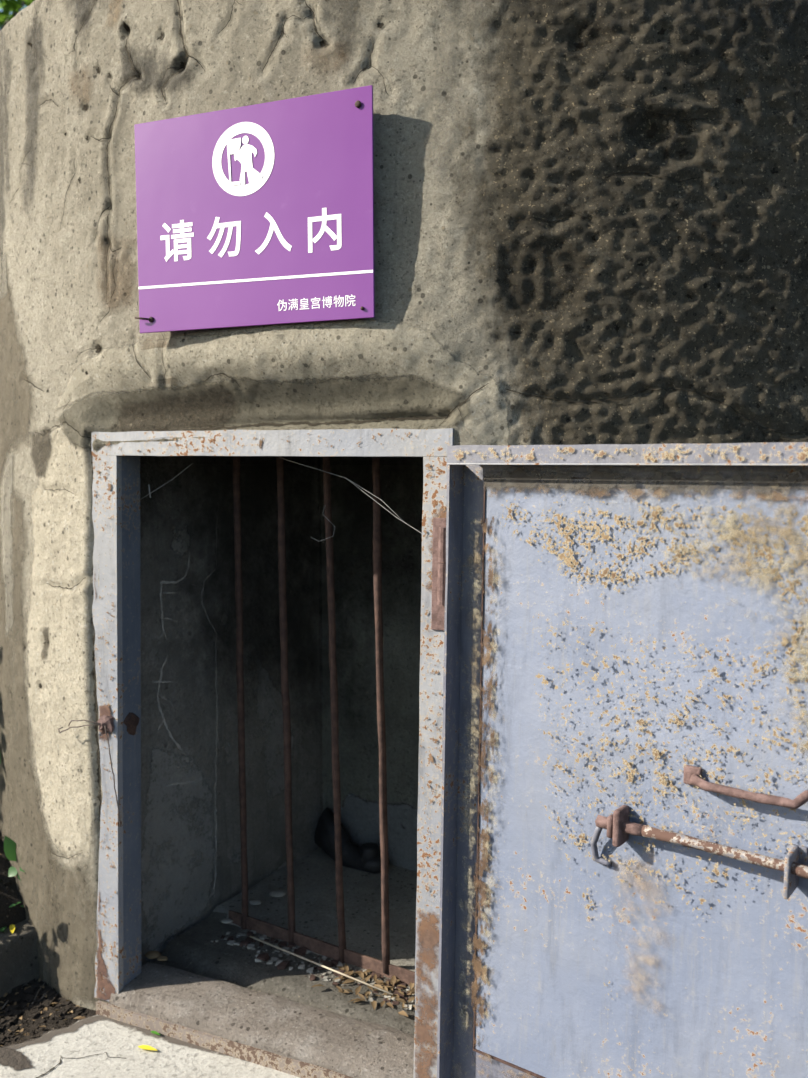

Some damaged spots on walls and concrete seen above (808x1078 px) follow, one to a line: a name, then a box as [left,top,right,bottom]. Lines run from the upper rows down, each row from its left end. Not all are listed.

crack [262,1,328,72]
crack [353,44,388,94]
crack [77,0,205,368]
damp [471,0,808,445]
crack [147,384,808,435]
corrosion [94,573,115,749]
corrosion [420,718,441,818]
corrosion [453,445,808,1045]
corrosion [96,878,116,1001]
corrosion [414,877,439,1078]
crack [36,1052,120,1078]